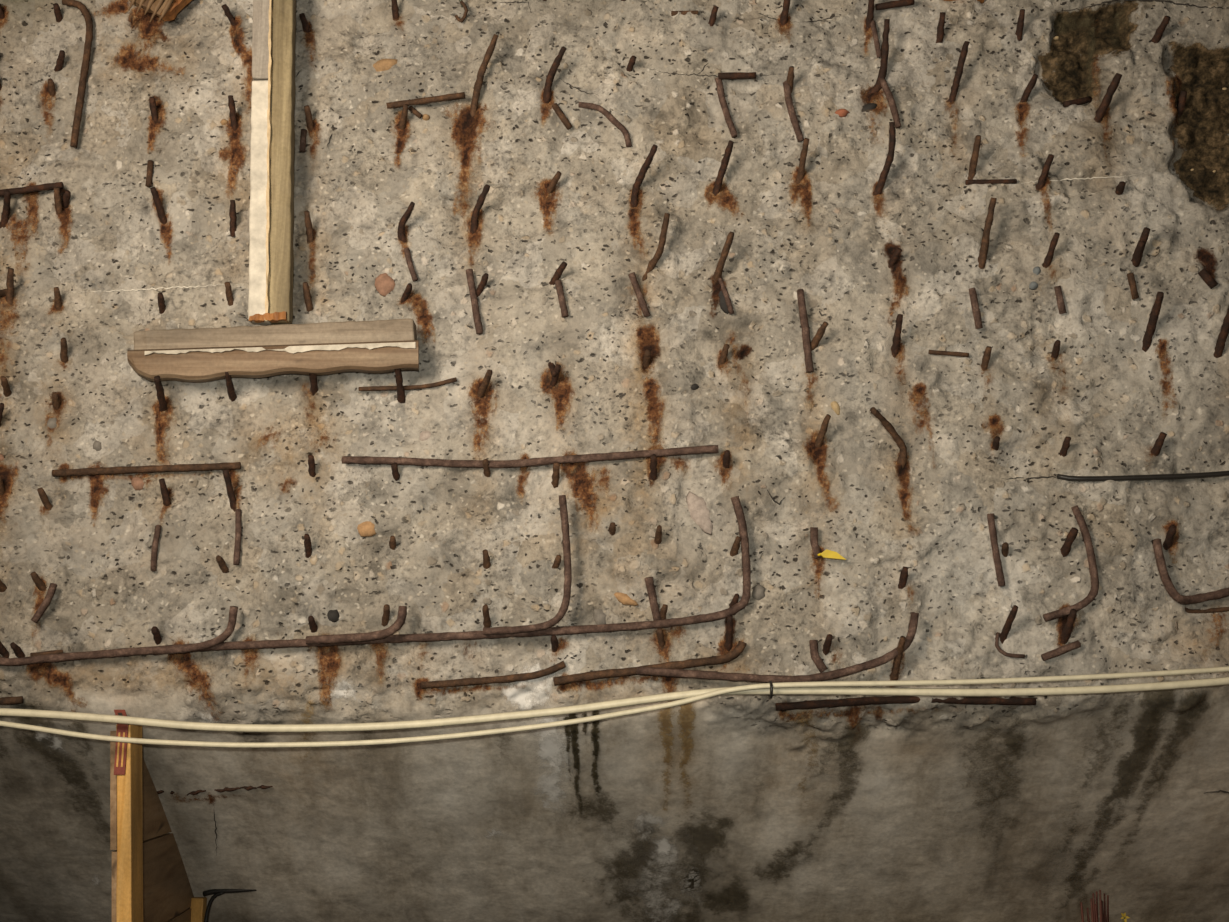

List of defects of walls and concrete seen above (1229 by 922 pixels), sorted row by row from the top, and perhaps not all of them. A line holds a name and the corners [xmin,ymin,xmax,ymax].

rust [219,16,253,196]
rust [447,103,487,265]
spalling [866,0,915,196]
spalling [1020,1,1138,123]
rust [540,363,575,430]
rust [636,286,688,485]
spalling [0,445,919,689]
leakage [602,812,749,922]
leakage [754,725,869,880]
spalling [775,696,1036,711]
leakage [964,719,1024,841]
leakage [1063,681,1209,906]